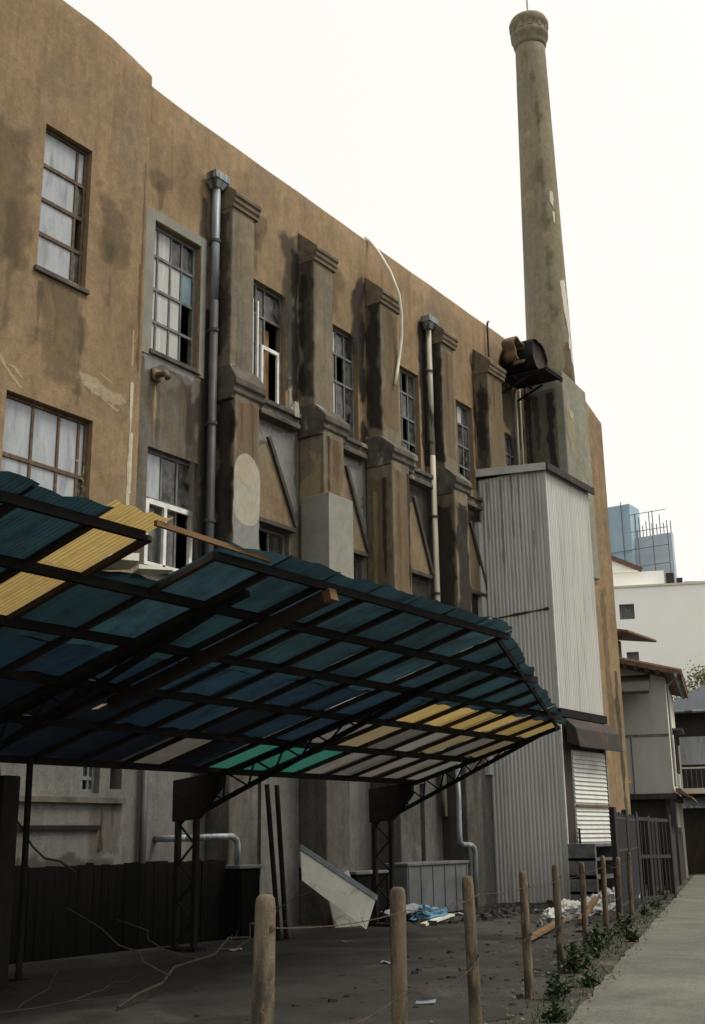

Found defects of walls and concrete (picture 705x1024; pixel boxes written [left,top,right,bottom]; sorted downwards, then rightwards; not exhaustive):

damp [284,249,307,402]
peeling [560,280,573,363]
damp [225,410,235,438]
damp [359,322,380,443]
damp [517,396,541,464]